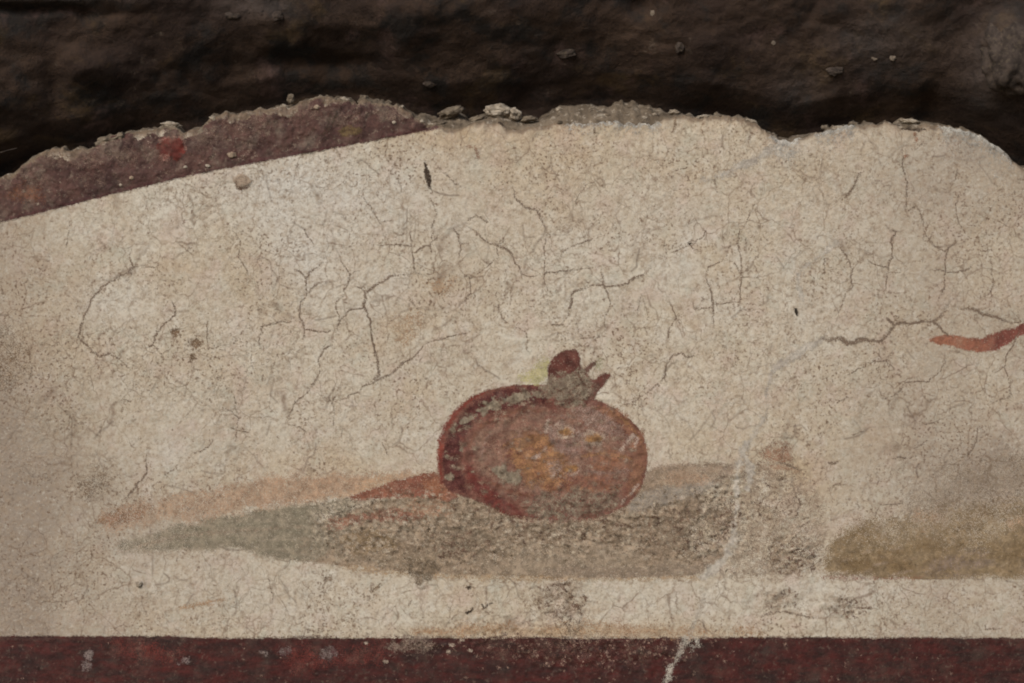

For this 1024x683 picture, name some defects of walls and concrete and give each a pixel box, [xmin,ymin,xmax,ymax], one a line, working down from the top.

spalling [423,162,432,191]
spalling [0,94,1024,178]
crack [72,248,176,416]
crack [122,372,249,502]
crack [206,186,759,441]
crack [662,141,1019,683]